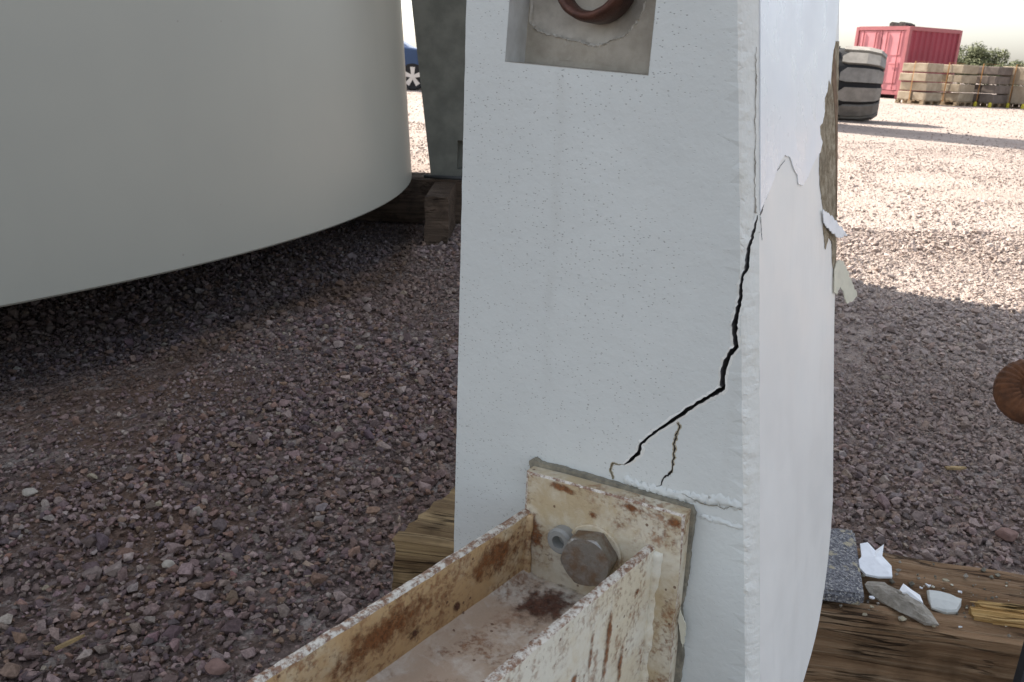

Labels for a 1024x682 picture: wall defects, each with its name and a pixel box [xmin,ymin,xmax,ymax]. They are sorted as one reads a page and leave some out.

peeling [759,0,857,304]
crack [609,47,785,510]
rust [550,482,573,495]
rust [473,535,516,582]
rust [531,516,542,545]
rust [333,598,432,678]
rust [515,589,574,622]
rust [588,613,623,681]